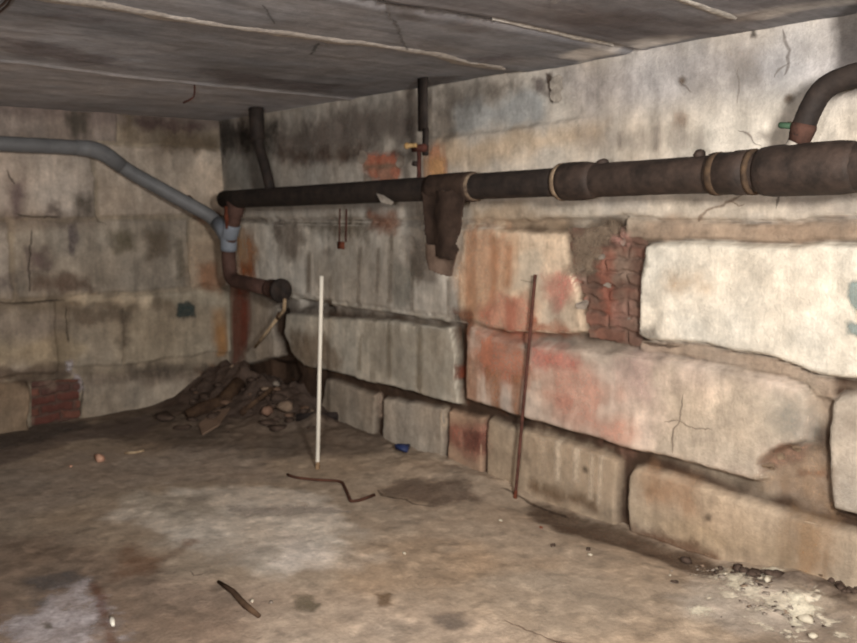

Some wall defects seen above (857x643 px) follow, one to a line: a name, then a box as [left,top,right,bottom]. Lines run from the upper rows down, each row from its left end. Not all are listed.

spalling [31,379,81,426]
rust [233,288,249,364]
rust [454,295,543,414]
spalling [567,219,656,346]
damp [518,441,848,642]